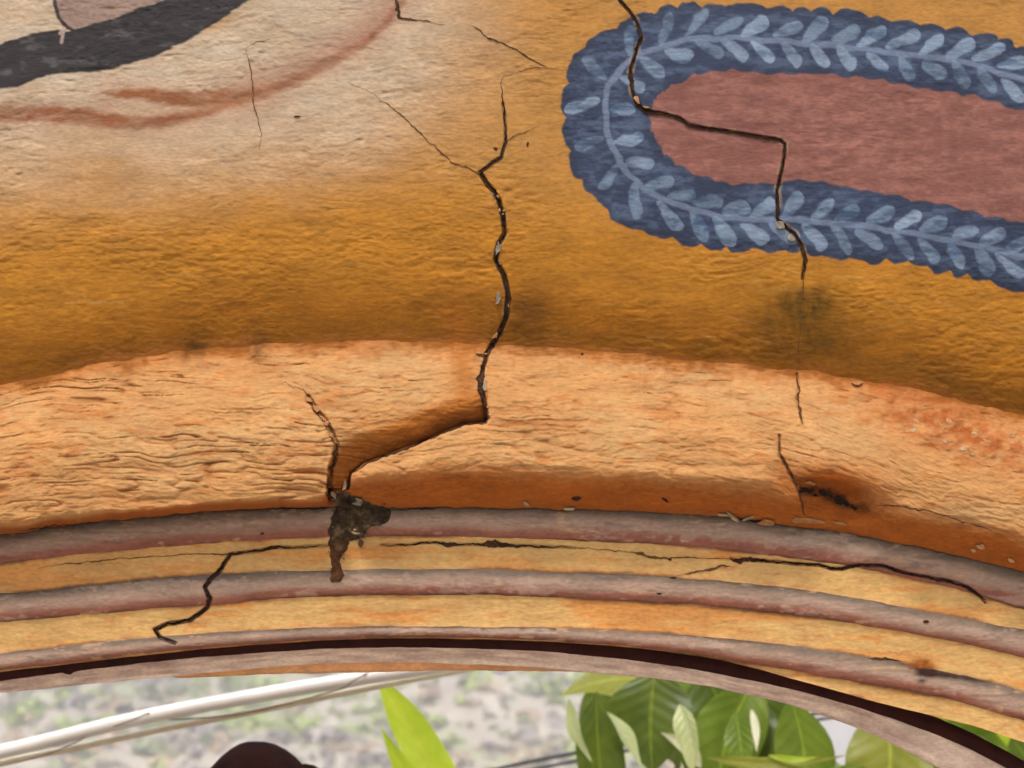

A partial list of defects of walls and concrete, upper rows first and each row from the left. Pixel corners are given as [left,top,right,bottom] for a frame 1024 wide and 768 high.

crack [395,0,444,25]
crack [618,0,808,423]
crack [263,27,566,510]
crack [779,437,804,513]
crack [43,545,325,643]
spalling [327,480,391,583]
crack [386,539,1024,610]